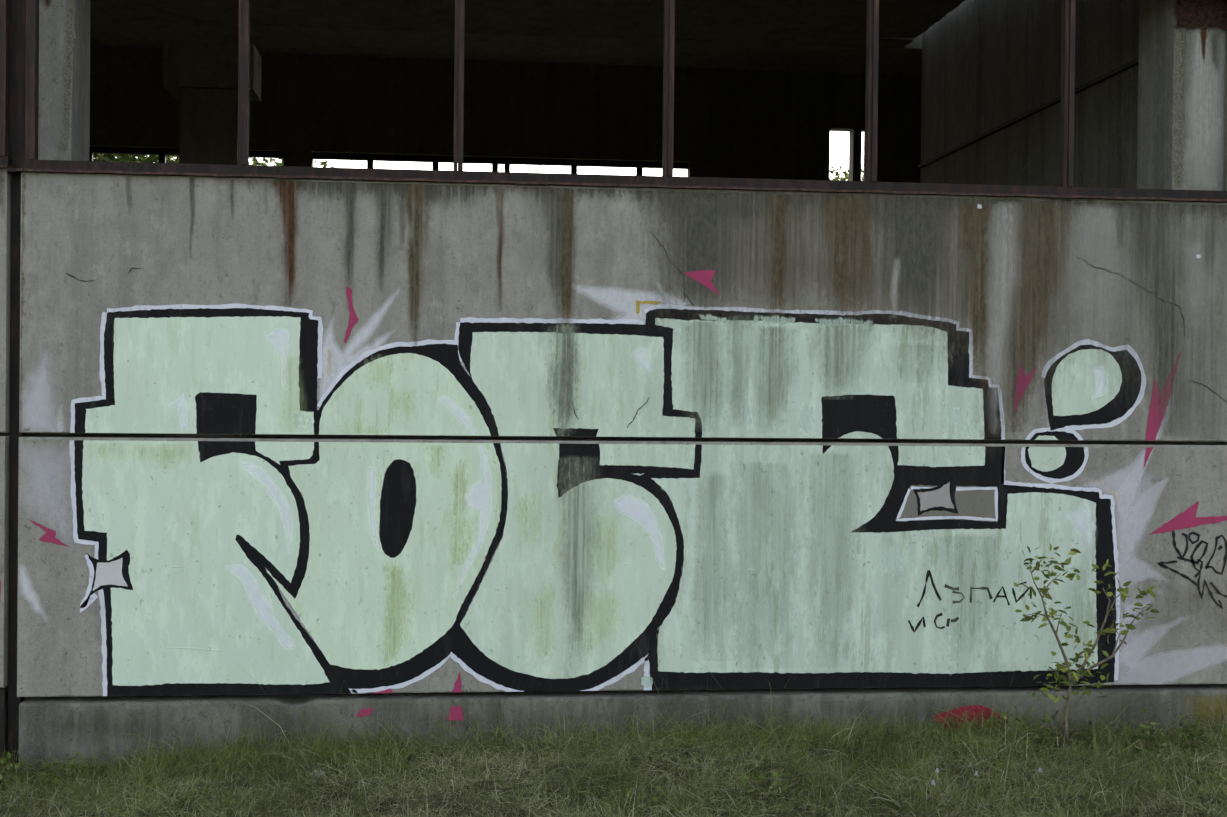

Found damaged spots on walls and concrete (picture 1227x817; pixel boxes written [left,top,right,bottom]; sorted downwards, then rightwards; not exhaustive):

corrosion [1174,0,1227,142]
corrosion [280,180,296,296]
leakage [272,181,499,338]
leakage [523,187,1227,436]
crack [1076,256,1185,337]
leakage [568,463,590,635]